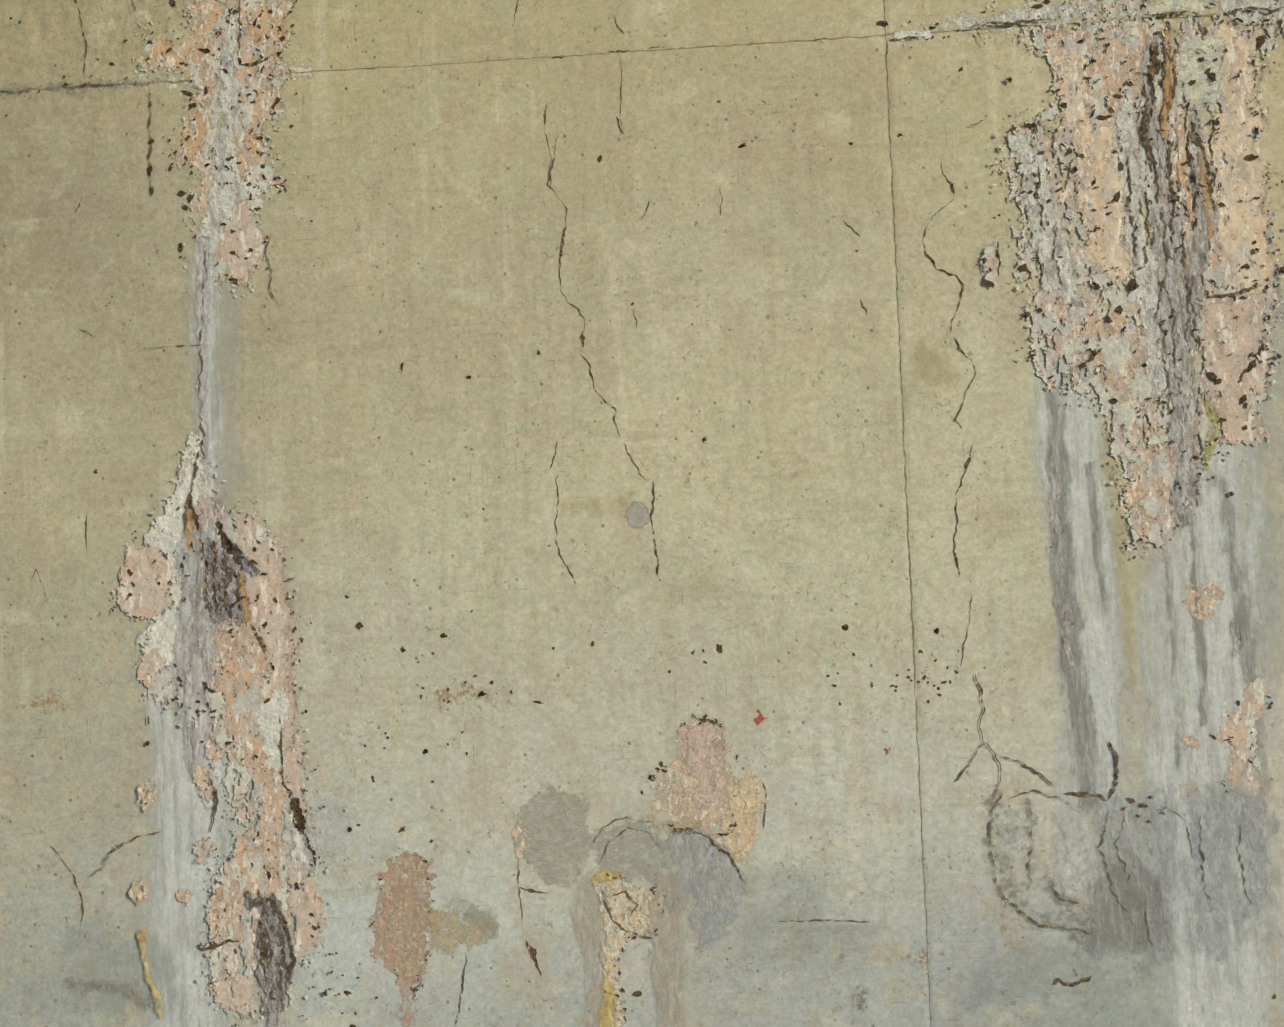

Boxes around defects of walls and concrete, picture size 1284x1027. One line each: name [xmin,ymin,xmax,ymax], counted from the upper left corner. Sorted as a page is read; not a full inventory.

water stain [66,669,233,1027]
water stain [177,236,222,516]
spalling [124,0,298,305]
spalling [110,438,334,1027]
spalling [369,851,498,1027]
crack [543,105,659,579]
spalling [592,713,769,1027]
crack [922,163,1052,796]
water stain [1036,354,1125,809]
spalling [980,0,1284,559]
water stain [1140,440,1270,1027]
spalling [1181,671,1273,813]